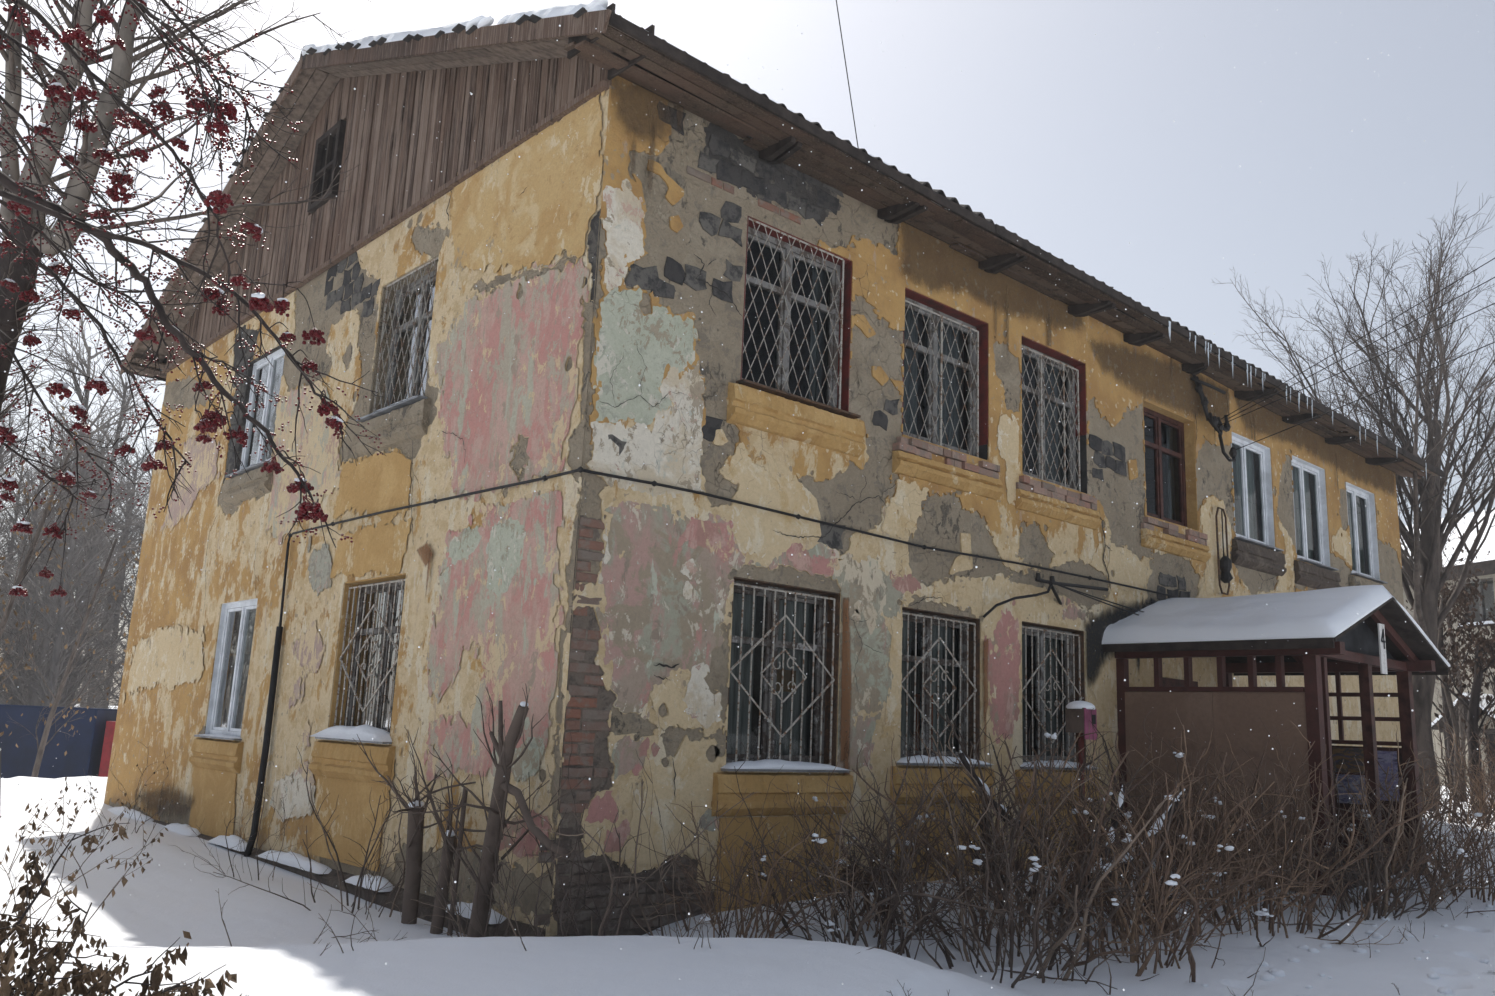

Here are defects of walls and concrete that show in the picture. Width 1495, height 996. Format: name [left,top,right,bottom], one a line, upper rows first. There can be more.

flaking render [160,91,1317,937]
peeling [122,624,212,705]
flaking render [109,798,191,825]